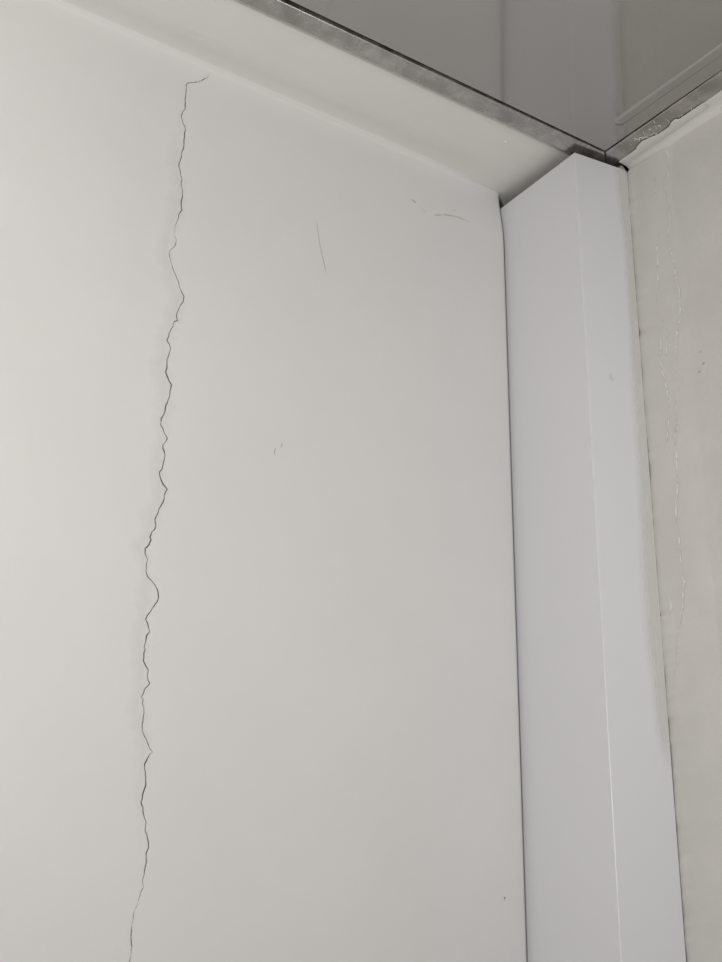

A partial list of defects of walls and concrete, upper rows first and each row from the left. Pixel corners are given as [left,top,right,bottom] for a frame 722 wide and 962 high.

crack [129,77,208,961]